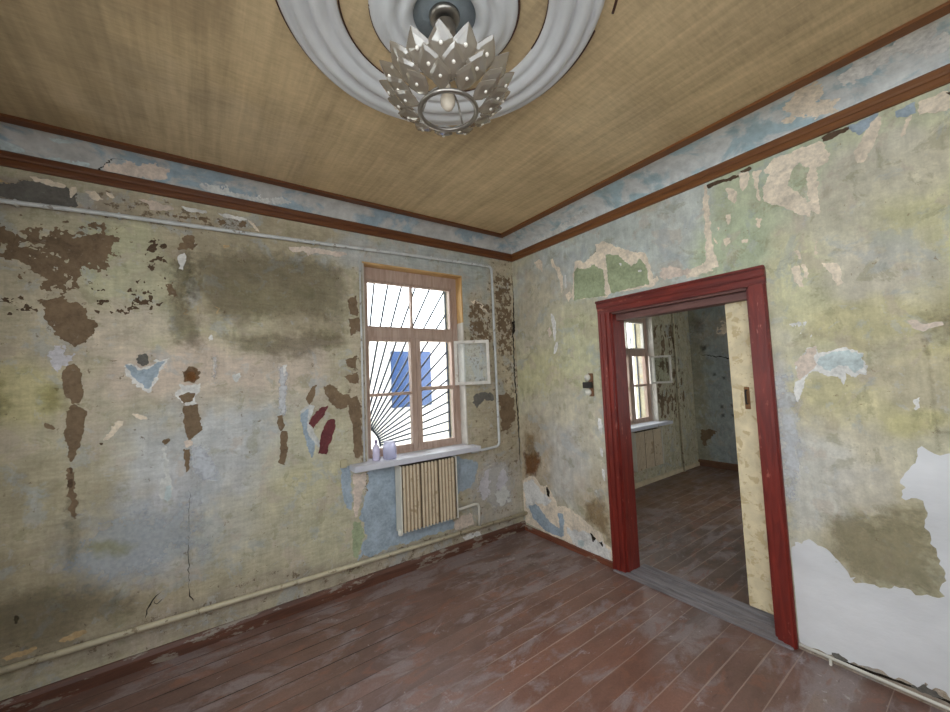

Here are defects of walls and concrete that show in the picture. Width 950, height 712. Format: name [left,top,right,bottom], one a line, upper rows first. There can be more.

peeling [895,91,950,137]
spalling [0,176,114,208]
peeling [0,220,178,347]
peeling [145,235,197,271]
peeling [139,199,259,232]
peeling [347,296,363,336]
peeling [468,276,513,355]
peeling [531,113,881,302]
peeling [44,363,87,519]
peeling [300,355,363,458]
spalling [472,392,516,432]
spalling [523,476,612,561]